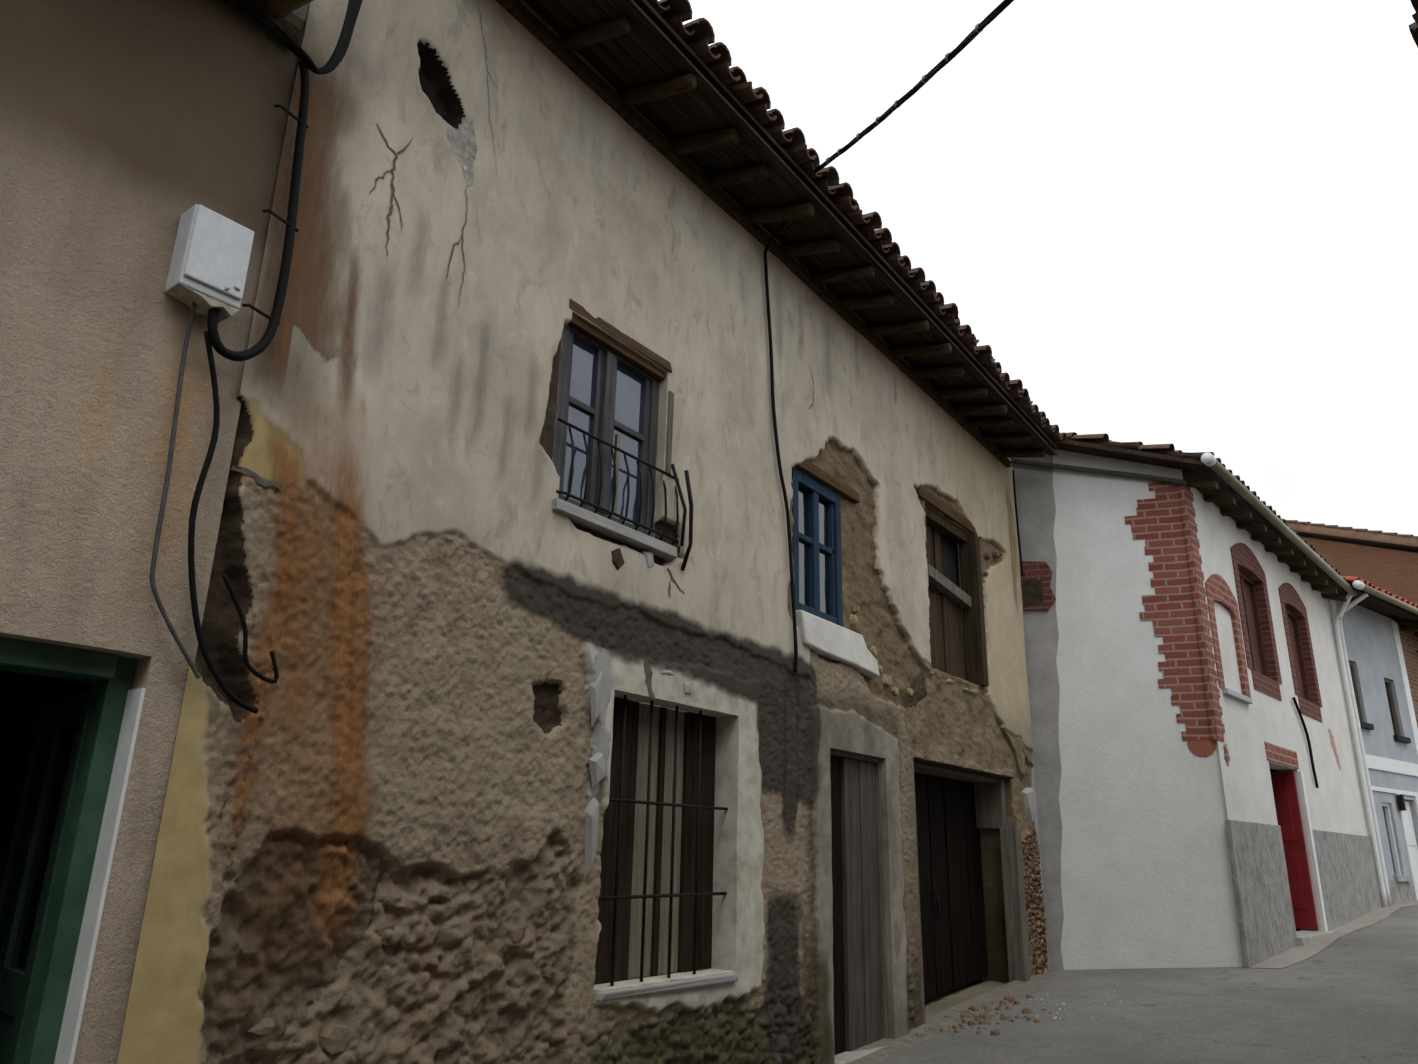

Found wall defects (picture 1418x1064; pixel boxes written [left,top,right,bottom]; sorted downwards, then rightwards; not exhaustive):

crack [370,123,414,256]
spalling [417,39,478,187]
crack [446,6,498,306]
flaking render [539,324,565,461]
flaking render [572,520,681,571]
flaking render [644,661,691,699]
flaking render [789,439,1056,976]
flaking render [197,651,613,1064]